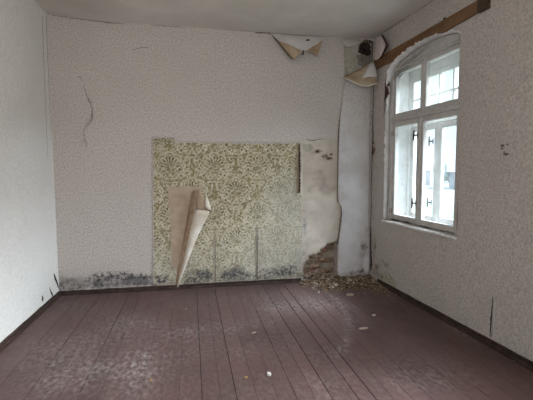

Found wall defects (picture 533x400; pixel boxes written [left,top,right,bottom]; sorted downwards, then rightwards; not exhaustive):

peeling [271,33,324,60]
peeling [342,39,378,87]
crack [78,76,93,147]
peeling [300,138,342,280]
leakage [89,272,169,286]